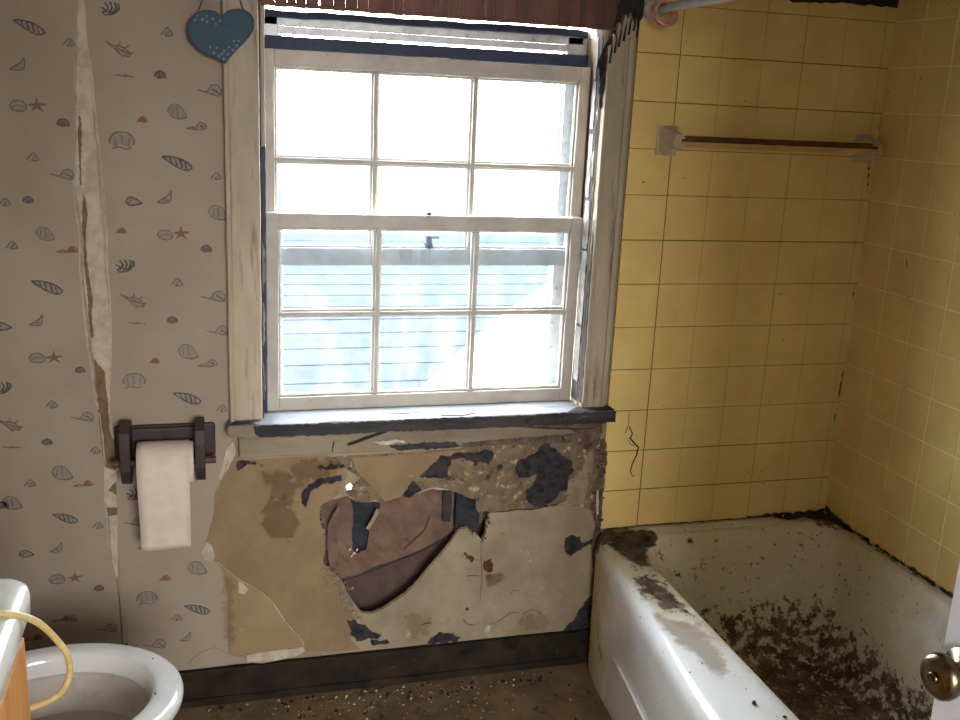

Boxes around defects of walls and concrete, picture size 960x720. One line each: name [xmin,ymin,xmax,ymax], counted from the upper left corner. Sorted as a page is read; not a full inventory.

crack [641,9,860,126]
peeling [218,30,616,628]
crack [599,157,808,530]
leakage [516,443,573,507]
peeling [201,542,215,562]